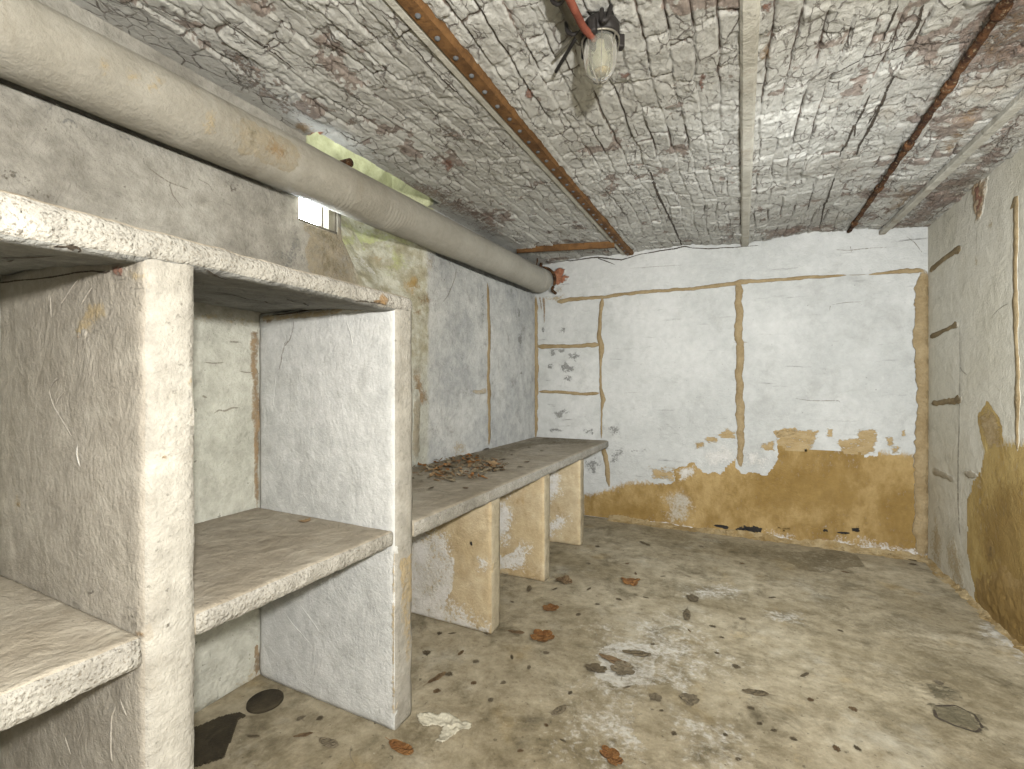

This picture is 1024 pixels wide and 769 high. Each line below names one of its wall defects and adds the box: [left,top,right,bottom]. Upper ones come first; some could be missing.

crack [218,11,295,70]
crack [381,14,478,113]
crack [536,3,576,77]
crack [807,4,961,229]
crack [149,168,213,208]
corrosion [517,241,615,253]
crack [566,170,760,268]
crack [835,237,922,253]
peeling [694,426,737,449]
peeling [758,427,907,457]
spalling [976,539,1024,646]